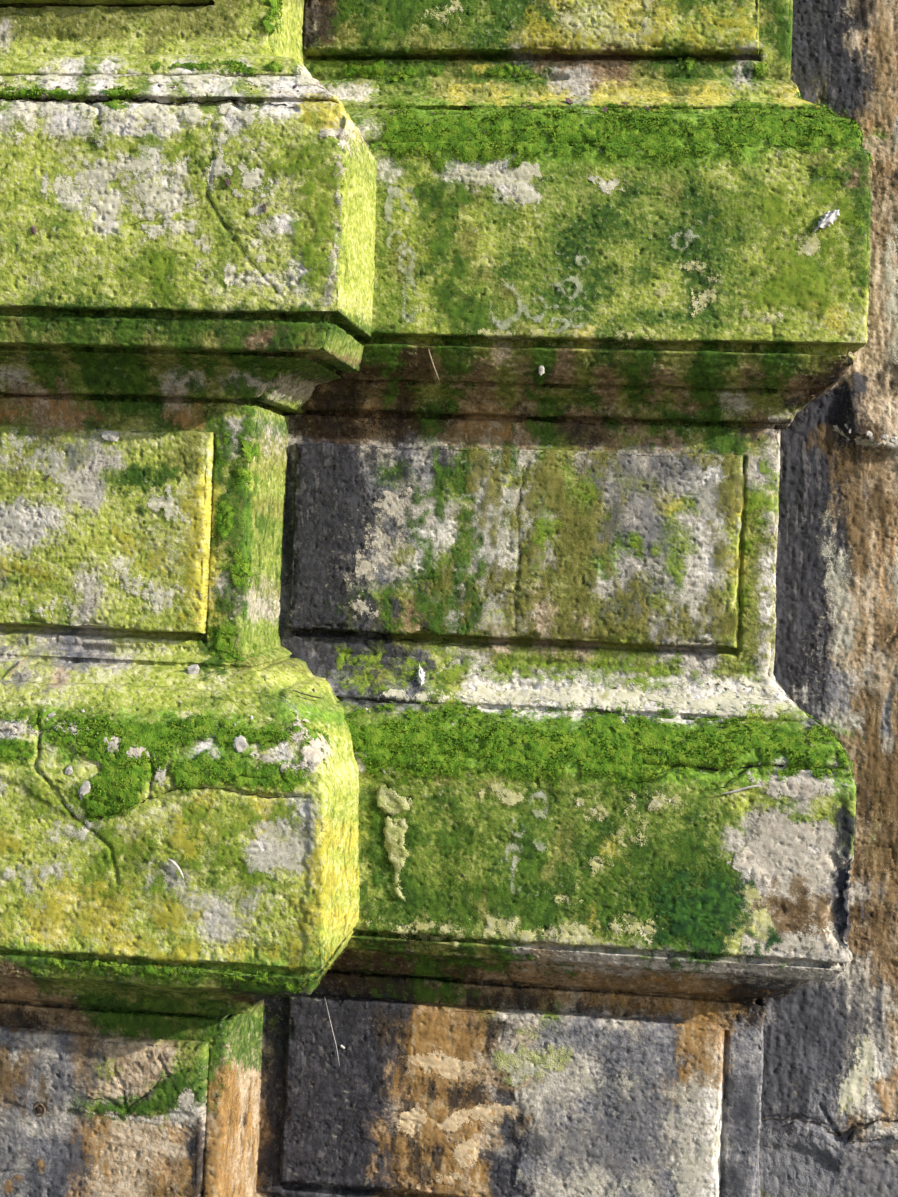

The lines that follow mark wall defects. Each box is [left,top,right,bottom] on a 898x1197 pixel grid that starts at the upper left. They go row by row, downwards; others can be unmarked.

water stain [302,0,347,50]
water stain [790,0,898,118]
crack [0,97,295,293]
water stain [0,149,898,735]
crack [34,720,304,875]
water stain [0,1040,104,1197]
water stain [140,1116,203,1197]
water stain [214,965,885,1197]